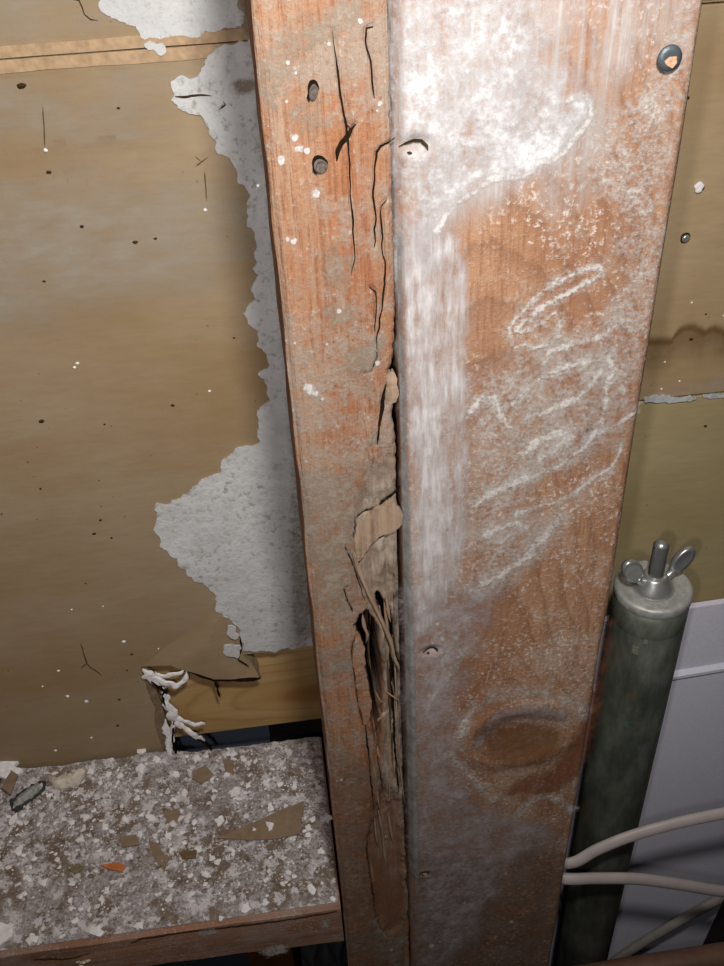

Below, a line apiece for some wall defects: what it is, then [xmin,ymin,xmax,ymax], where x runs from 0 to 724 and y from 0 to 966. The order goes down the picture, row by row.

peeling [98,0,245,56]
peeling [153,39,313,658]
crack [332,26,395,444]
leakage [394,0,636,636]
leakage [648,325,724,345]
crack [343,486,400,930]